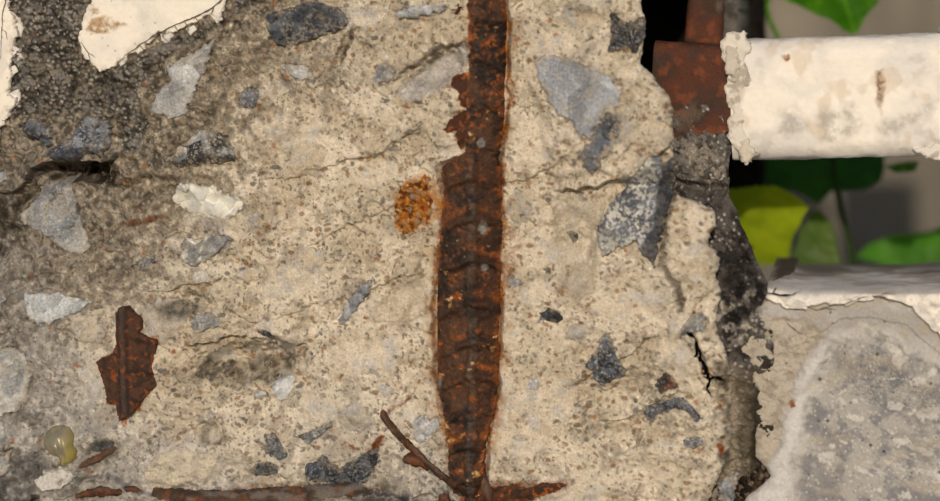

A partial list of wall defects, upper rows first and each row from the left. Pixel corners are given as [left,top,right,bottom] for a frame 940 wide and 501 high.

corrosion [683,0,725,45]
spalling [8,0,226,153]
peeling [720,30,760,165]
corrosion [394,174,441,235]
spalling [370,0,508,501]
spalling [553,196,605,302]
peeling [848,293,875,301]
spalling [96,305,158,421]
crack [687,331,725,397]
peeling [34,469,76,492]
spalling [144,422,227,489]
spalling [802,347,940,501]